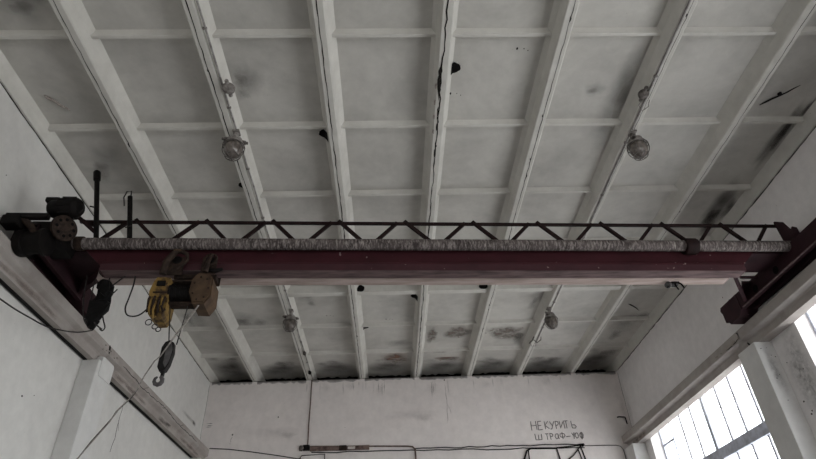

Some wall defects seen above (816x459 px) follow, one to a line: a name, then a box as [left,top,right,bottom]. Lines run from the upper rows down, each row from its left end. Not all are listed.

crack [315,0,345,239]
crack [428,0,449,237]
leakage [769,123,792,150]